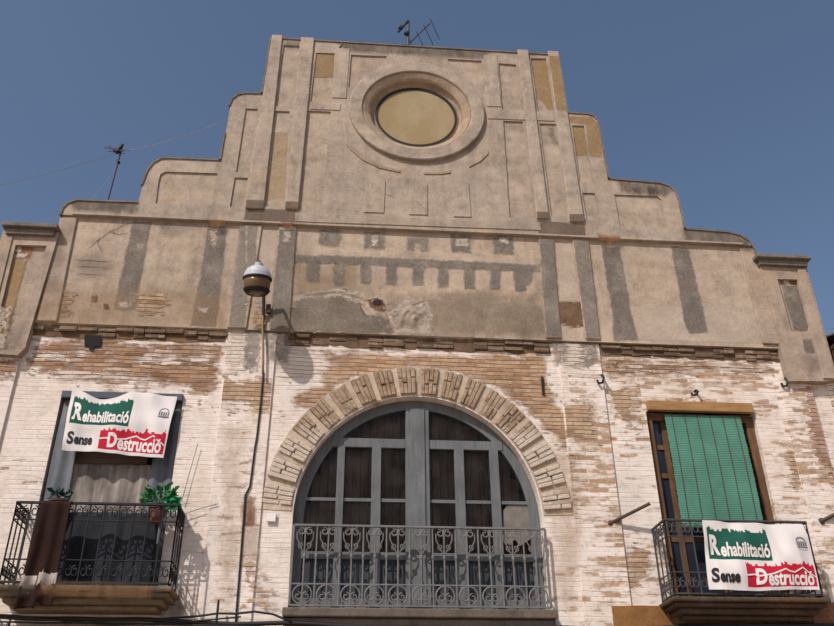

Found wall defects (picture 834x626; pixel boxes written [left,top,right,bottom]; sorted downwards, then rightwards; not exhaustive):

crack [77,224,125,275]
peeling [333,291,433,335]
peeling [0,330,602,495]
peeling [797,386,834,488]
peeling [773,441,801,492]
peeling [240,562,278,608]
peeling [625,542,654,595]